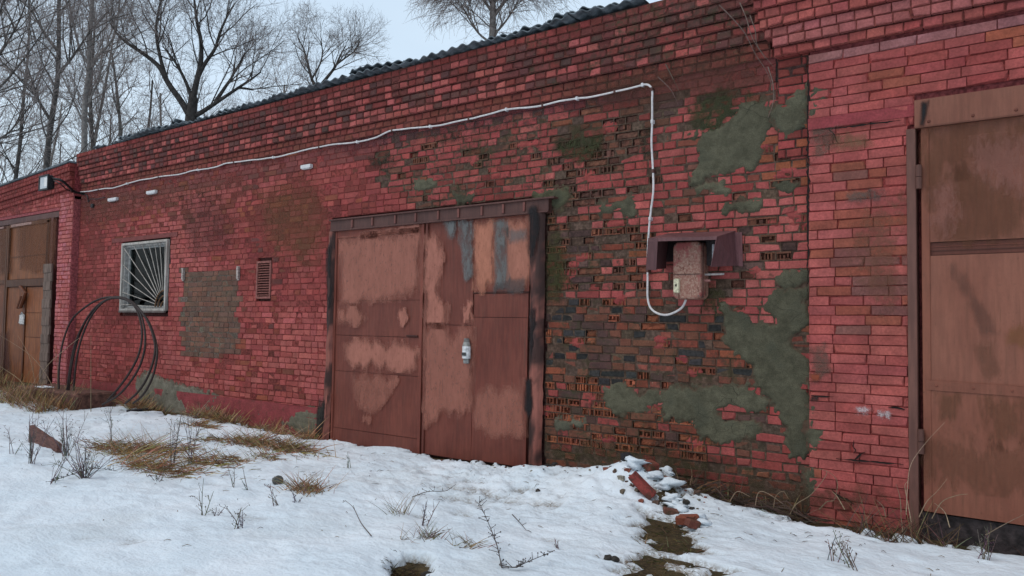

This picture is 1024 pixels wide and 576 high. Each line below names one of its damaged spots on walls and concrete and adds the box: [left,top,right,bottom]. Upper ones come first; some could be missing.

spalling [510,106,654,322]
spalling [732,210,807,288]
spalling [564,330,596,348]
spalling [642,315,715,377]